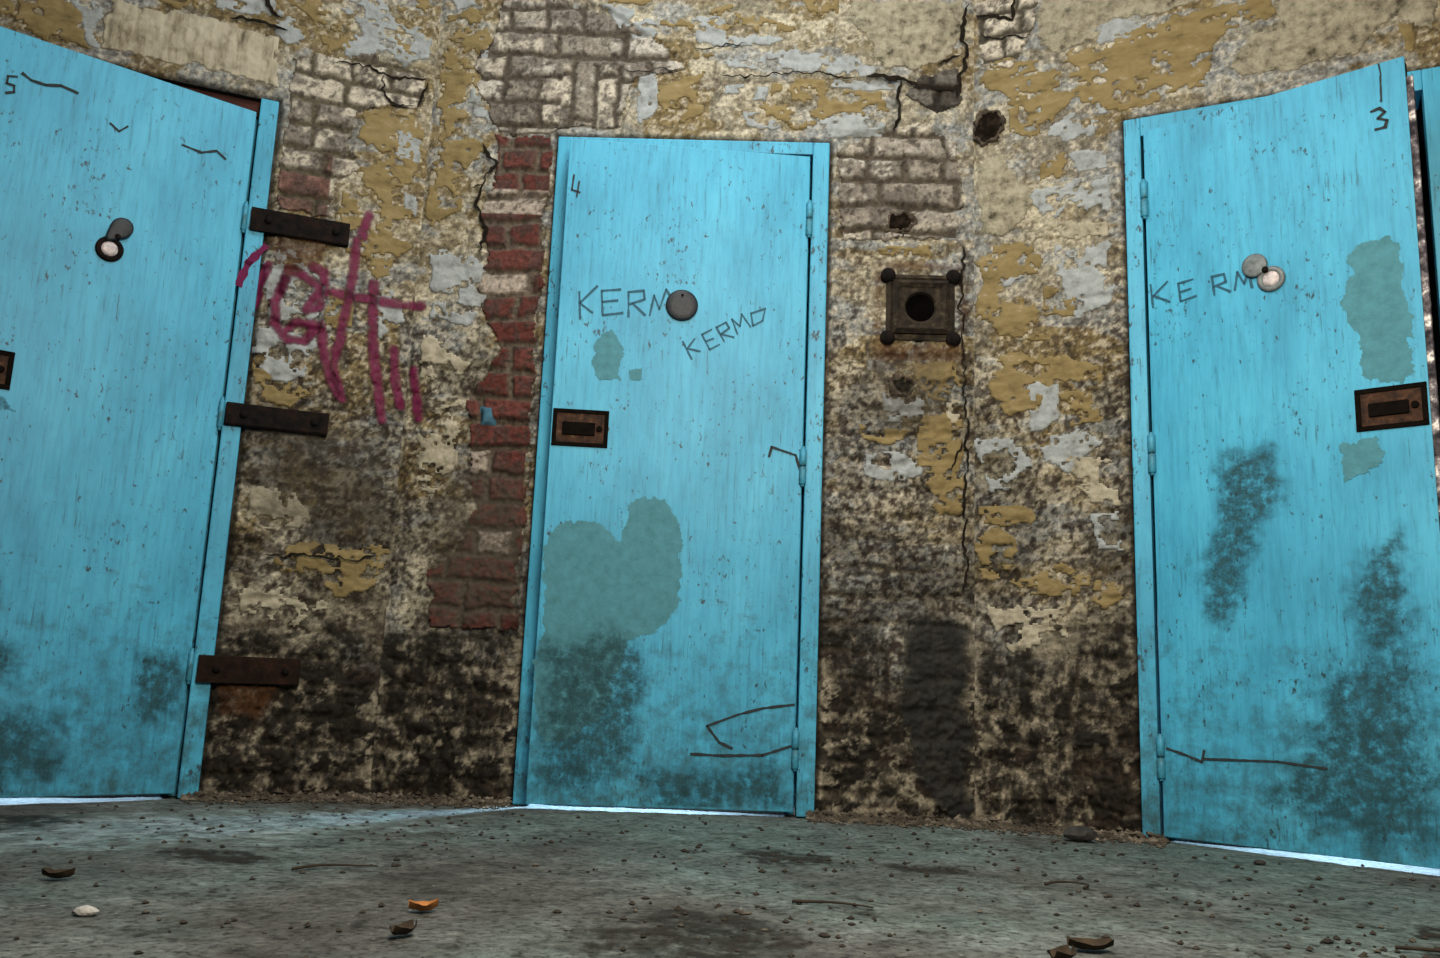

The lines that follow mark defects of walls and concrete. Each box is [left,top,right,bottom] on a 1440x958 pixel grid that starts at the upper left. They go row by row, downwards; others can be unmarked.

peeling [0,0,105,49]
crack [623,0,1029,129]
flaking render [215,0,964,631]
peeling [858,0,1279,654]
peeling [1340,235,1416,383]
peeling [1339,436,1385,482]
damp [202,626,514,800]
damp [829,613,929,814]
damp [977,631,1139,832]